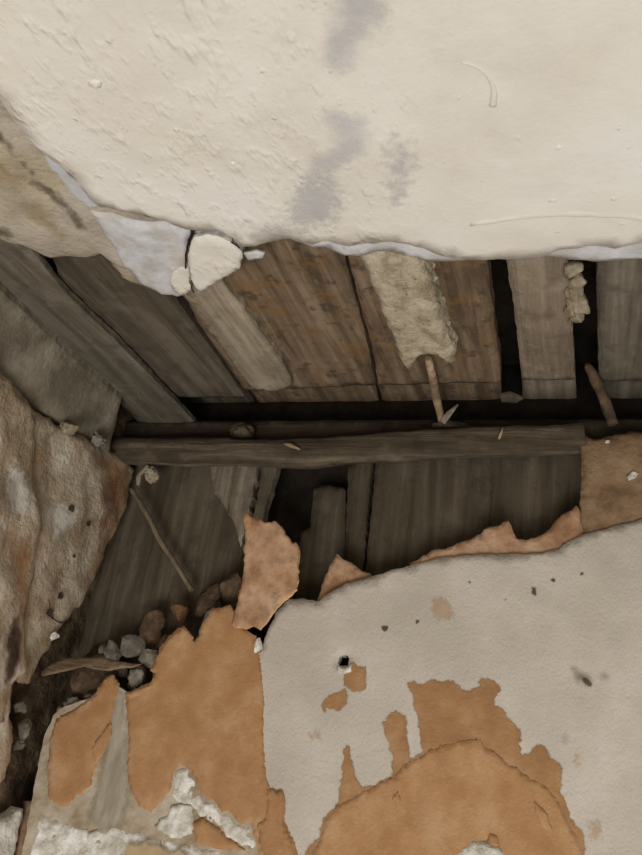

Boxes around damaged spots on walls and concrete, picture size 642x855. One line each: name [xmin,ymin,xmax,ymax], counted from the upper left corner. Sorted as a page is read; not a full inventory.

crack [185,231,203,294]
spalling [285,238,476,261]
spalling [506,243,642,262]
spalling [91,431,107,447]
flaking render [410,431,642,565]
peeling [0,512,586,855]